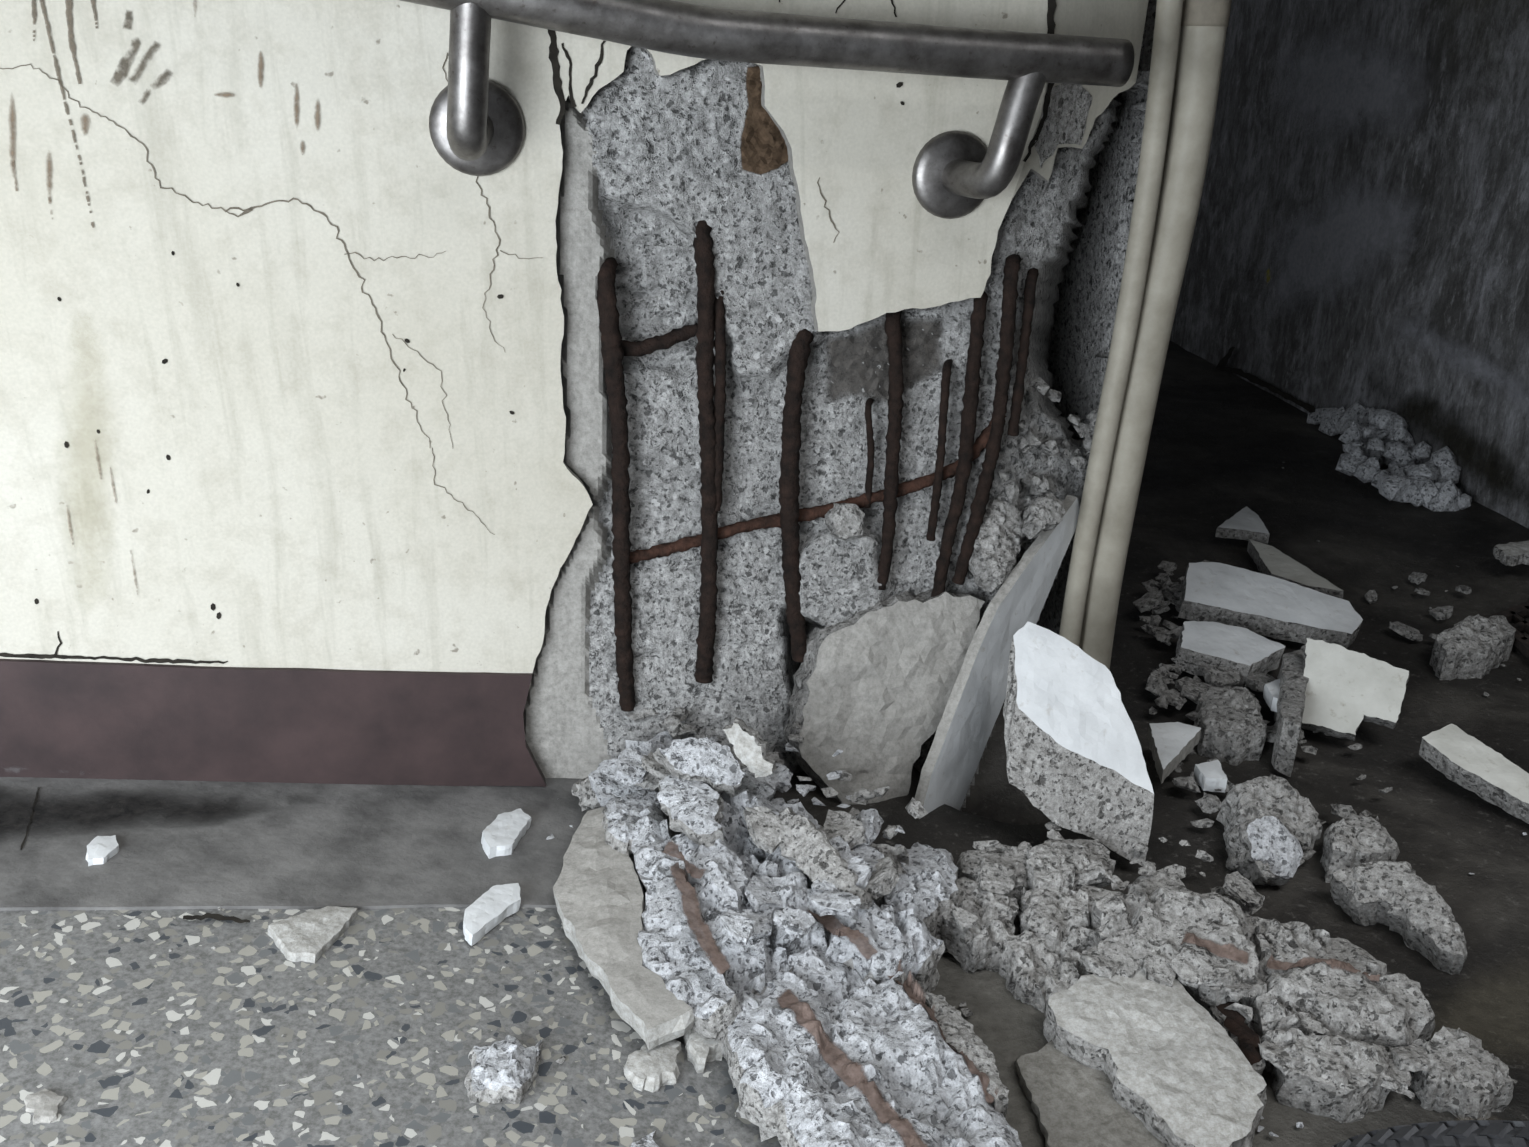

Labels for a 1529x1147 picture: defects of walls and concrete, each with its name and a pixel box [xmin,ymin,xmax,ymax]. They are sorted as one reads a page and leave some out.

crack [1047,0,1057,34]
corrosion [740,66,788,175]
crack [1023,83,1055,162]
crack [0,64,495,535]
spalling [523,46,1150,779]